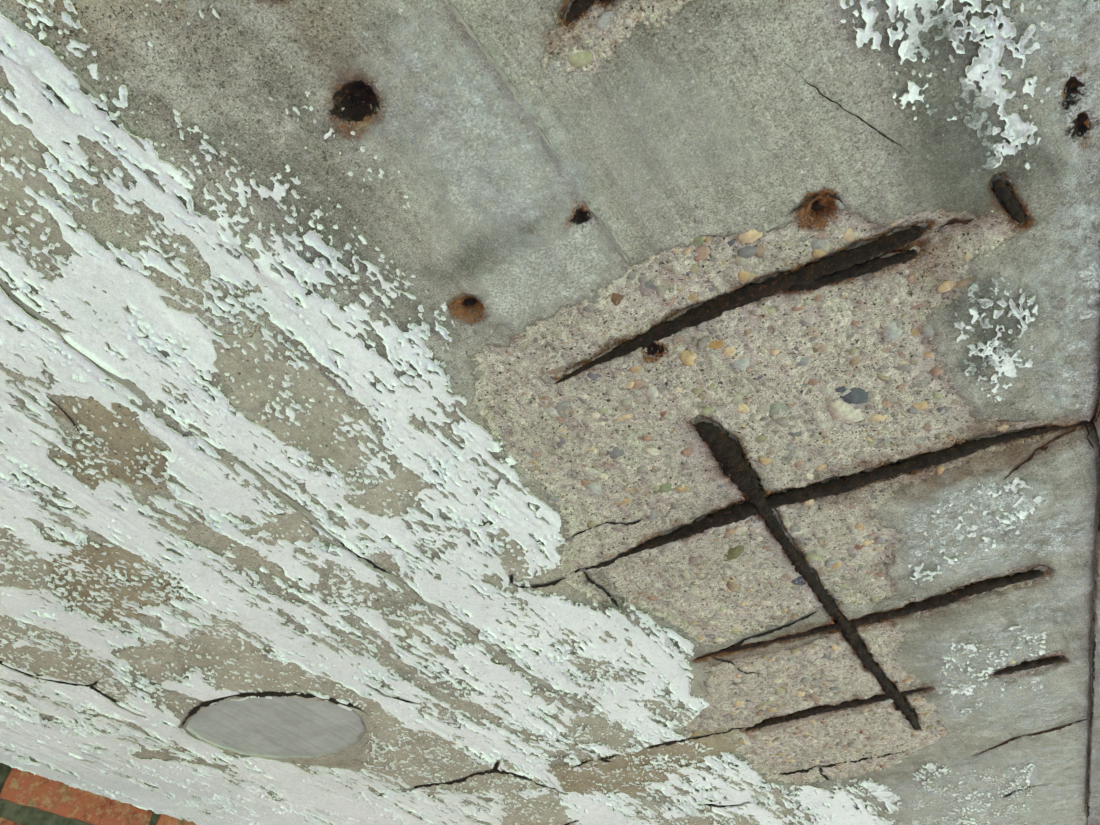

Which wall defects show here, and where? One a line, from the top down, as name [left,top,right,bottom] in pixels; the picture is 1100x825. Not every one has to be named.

spalling [324,71,412,209]
rust [551,0,614,39]
spalling [538,0,693,87]
peeling [840,0,1100,172]
water stain [920,5,1048,211]
rust [554,220,941,380]
peeling [963,288,1038,402]
rust [690,416,830,497]
spalling [772,434,1048,607]
crack [1004,410,1100,479]
rust [693,508,934,731]
crack [976,562,1097,824]